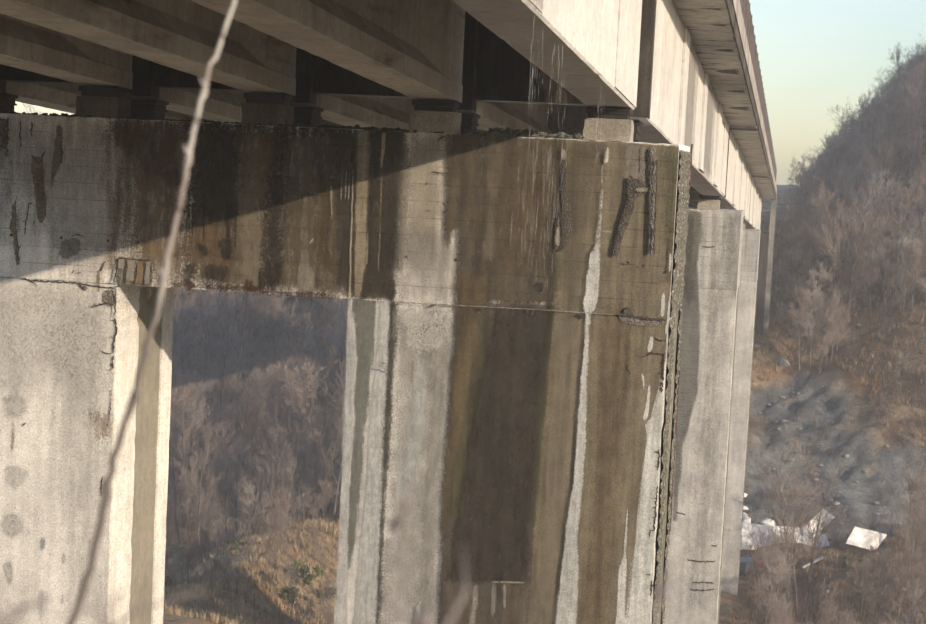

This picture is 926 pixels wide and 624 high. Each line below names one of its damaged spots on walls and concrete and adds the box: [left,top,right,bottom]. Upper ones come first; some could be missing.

spalling [92,255,153,316]
water stain [106,119,703,624]
spalling [613,144,693,624]